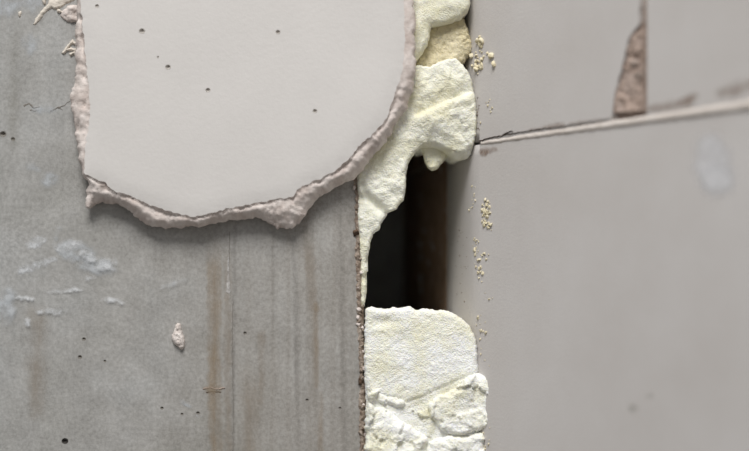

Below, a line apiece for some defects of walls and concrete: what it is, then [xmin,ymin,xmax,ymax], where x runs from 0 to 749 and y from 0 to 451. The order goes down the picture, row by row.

spalling [613,22,647,114]
crack [479,119,606,141]
efflorescence [19,241,111,279]
spalling [353,177,366,451]